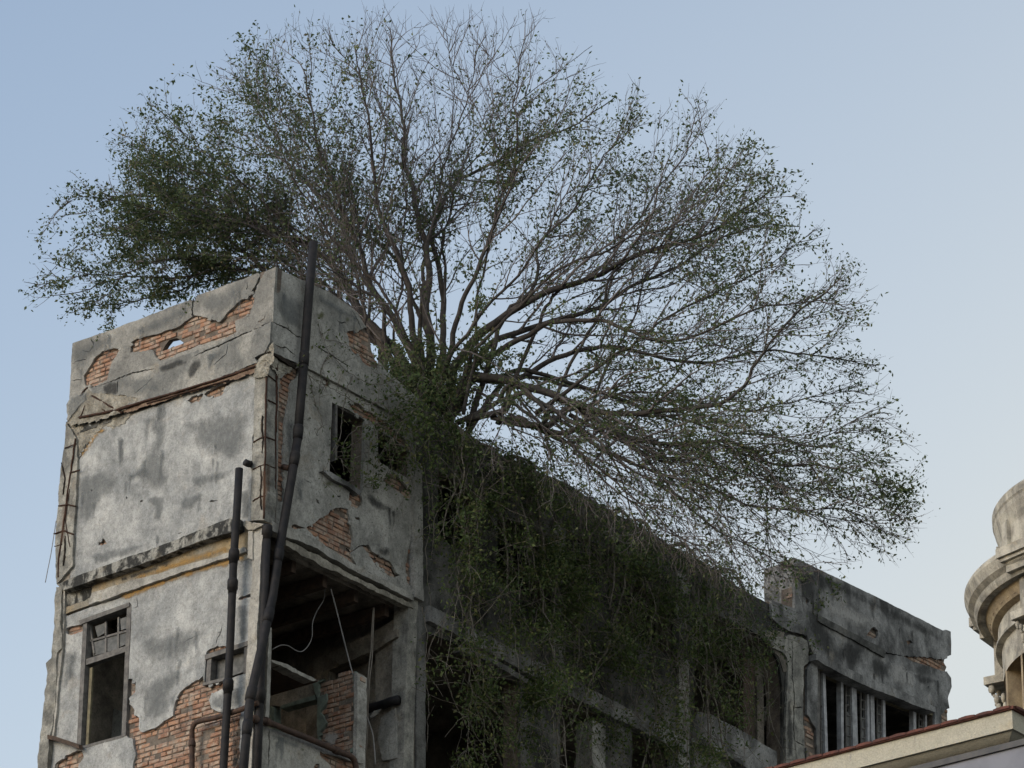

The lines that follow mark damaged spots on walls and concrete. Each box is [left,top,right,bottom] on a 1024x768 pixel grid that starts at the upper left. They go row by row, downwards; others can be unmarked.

spalling [344,329,377,367]
spalling [53,295,297,577]
spalling [288,508,410,584]
water stain [803,573,927,638]
water stain [873,660,939,693]
spalling [126,677,241,768]